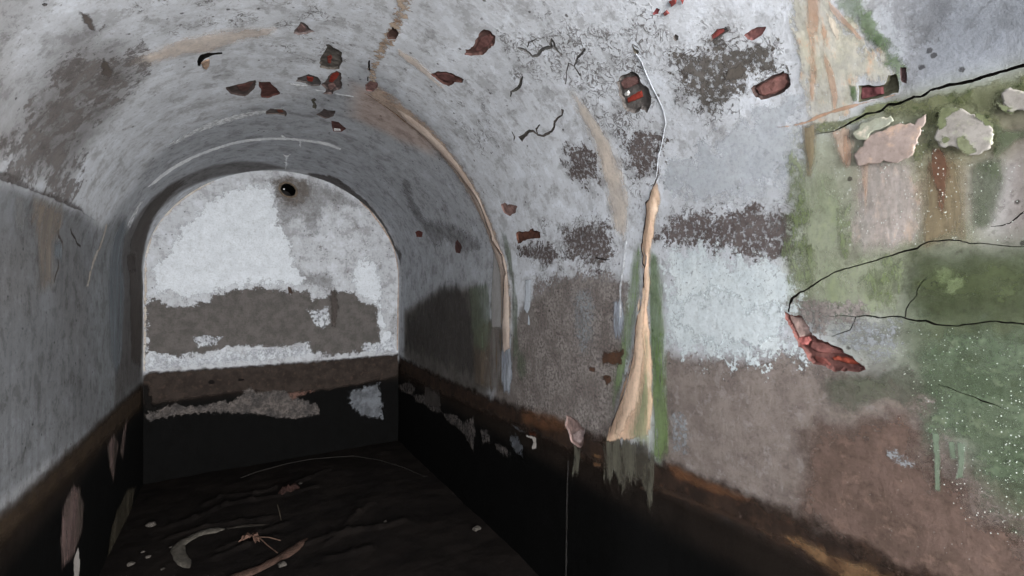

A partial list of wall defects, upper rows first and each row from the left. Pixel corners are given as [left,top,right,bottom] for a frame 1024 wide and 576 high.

crack [512,109,564,141]
crack [510,38,586,96]
flaking render [617,72,673,186]
peeling [662,24,791,121]
flaking render [858,67,907,102]
flaking render [852,114,926,166]
crack [817,64,1024,134]
water stain [368,0,512,392]
crack [788,212,1024,312]
crack [830,277,1024,336]
water stain [0,172,1024,576]
peeling [661,296,1024,540]